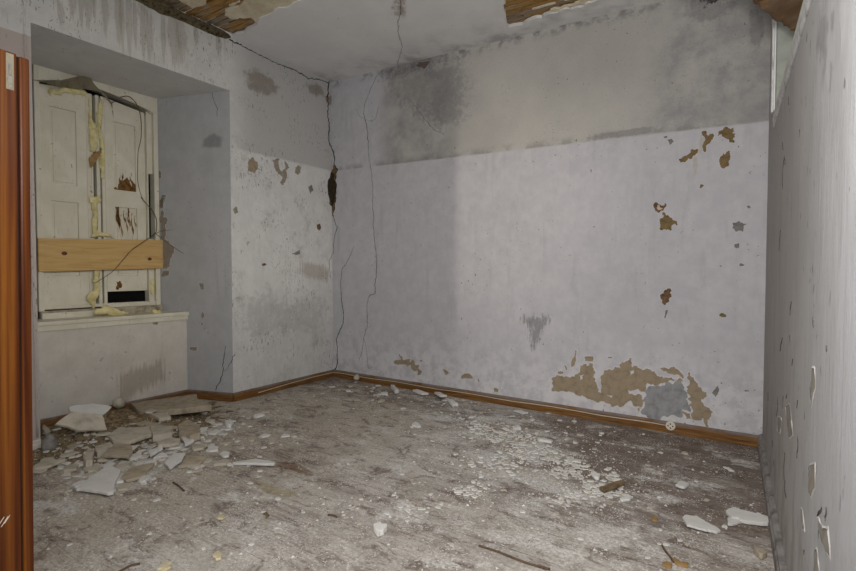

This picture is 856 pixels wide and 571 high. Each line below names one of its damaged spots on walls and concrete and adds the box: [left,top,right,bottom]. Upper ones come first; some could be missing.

spalling [159,0,296,33]
spalling [504,0,593,24]
crack [229,39,335,165]
peeling [247,157,258,174]
peeling [271,158,301,185]
peeling [678,126,736,189]
peeling [653,202,678,231]
crack [329,215,354,369]
peeling [394,353,423,376]
peeling [551,349,723,427]
peeling [803,507,831,571]